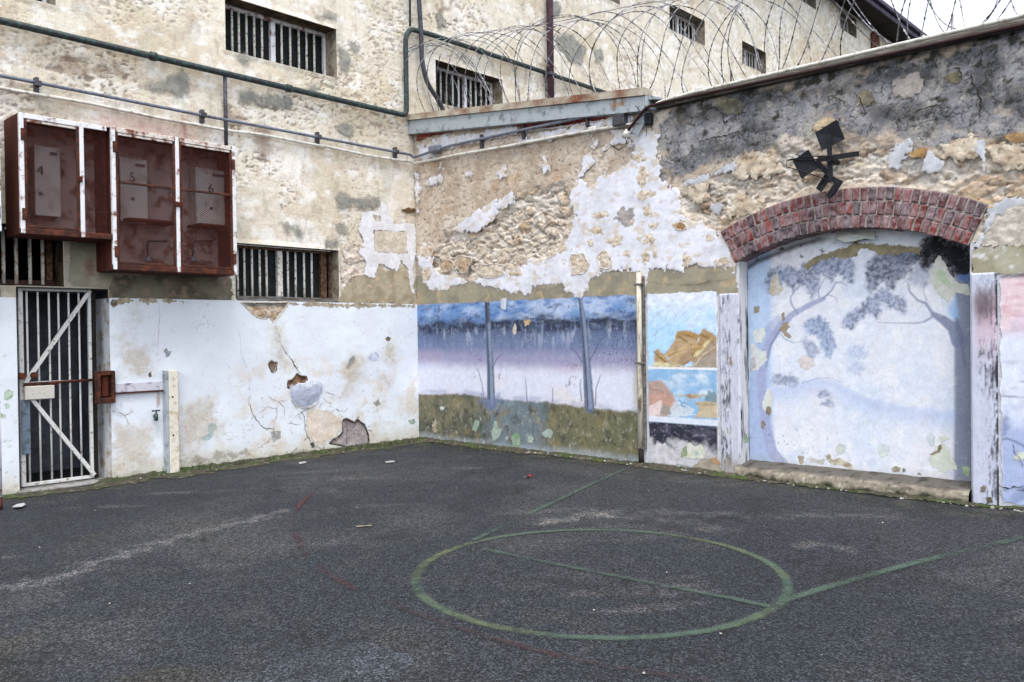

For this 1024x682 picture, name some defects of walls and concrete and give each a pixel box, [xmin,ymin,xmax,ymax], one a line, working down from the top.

flaking render [892,71,924,98]
flaking render [812,117,835,133]
flaking render [888,131,1024,174]
flaking render [240,116,784,323]
flaking render [972,195,1024,250]
peeling [803,230,921,271]
peeling [750,328,767,371]
flaking render [287,373,308,389]
crack [239,333,372,447]
peeling [306,408,370,448]
peeling [761,388,773,429]
peeling [927,432,970,477]